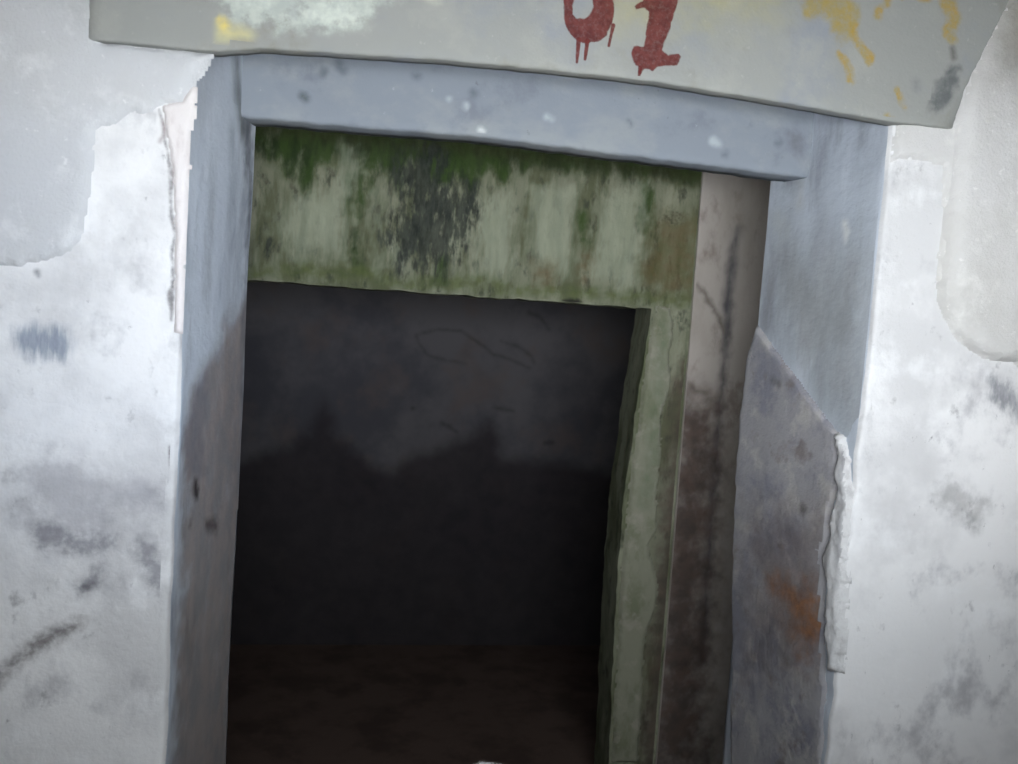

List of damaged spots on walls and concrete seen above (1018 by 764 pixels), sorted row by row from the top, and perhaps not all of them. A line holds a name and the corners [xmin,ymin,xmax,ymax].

damp [0,308,91,382]
damp [0,407,166,705]
peeling [162,87,198,334]
spalling [185,471,222,544]
damp [291,58,356,112]
damp [167,101,692,764]
spalling [611,306,674,762]
damp [616,337,745,764]
damp [691,171,701,197]
spalling [730,325,855,764]